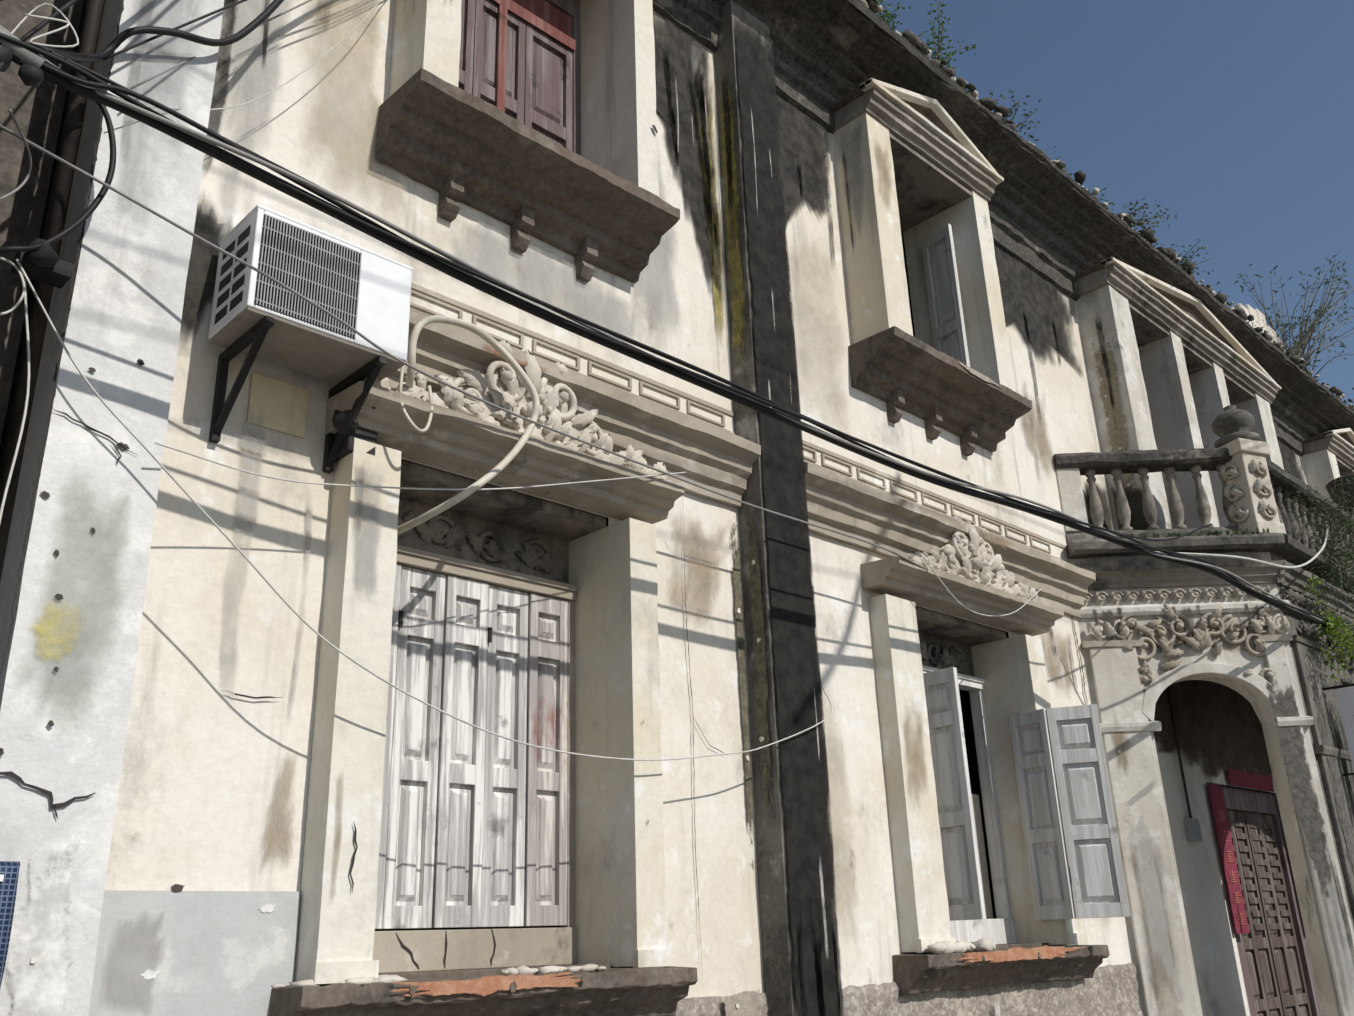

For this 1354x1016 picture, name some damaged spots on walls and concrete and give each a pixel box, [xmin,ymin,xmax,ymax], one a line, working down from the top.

crack [0,0,137,675]
leakage [994,244,1083,473]
leakage [653,8,861,1016]
crack [221,690,282,699]
crack [0,771,95,819]
crack [350,822,358,893]
crack [396,932,447,969]
crack [489,928,497,966]
spalling [954,945,1084,962]
spalling [391,972,586,996]